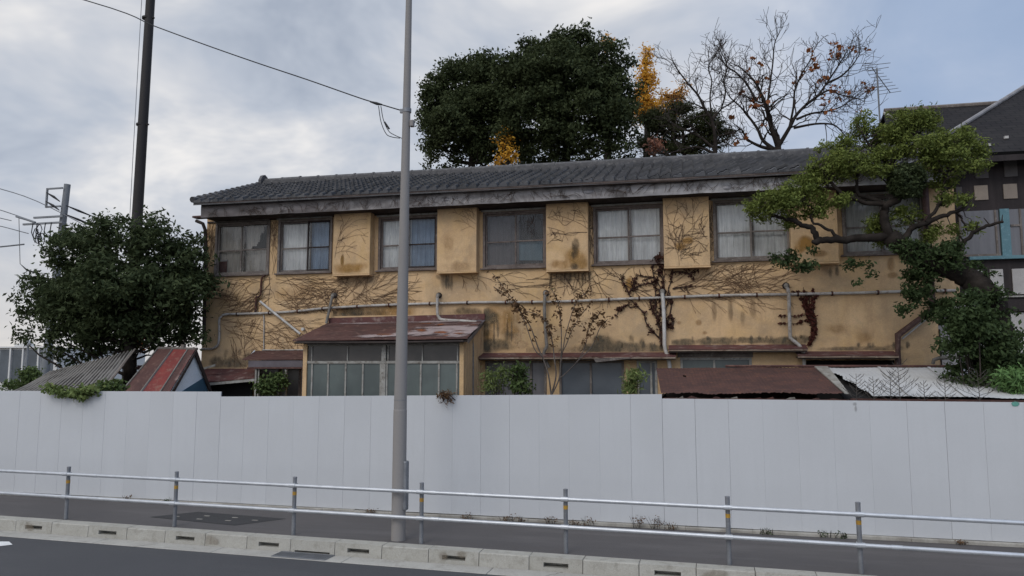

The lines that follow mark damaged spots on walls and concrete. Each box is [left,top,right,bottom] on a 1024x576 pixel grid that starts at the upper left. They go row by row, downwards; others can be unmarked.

water stain [550,245,590,283]
water stain [335,308,364,316]
water stain [456,308,515,352]
water stain [584,335,810,352]